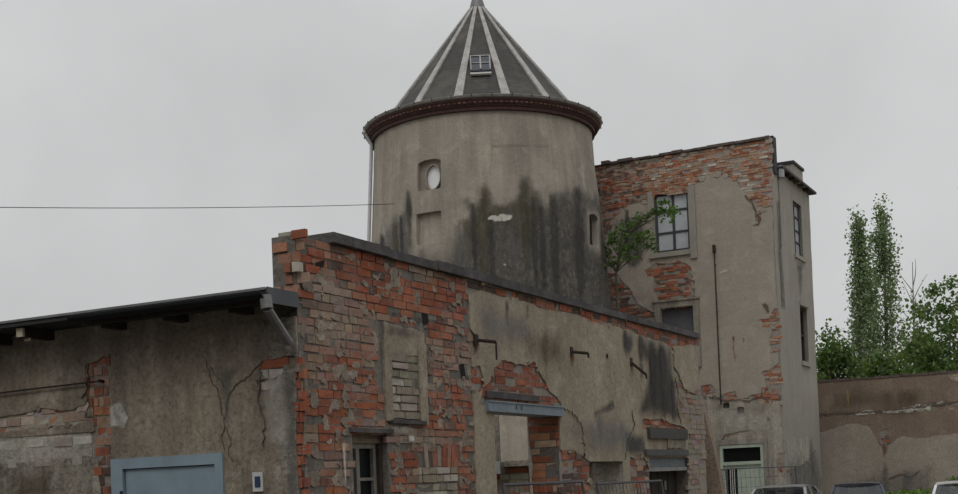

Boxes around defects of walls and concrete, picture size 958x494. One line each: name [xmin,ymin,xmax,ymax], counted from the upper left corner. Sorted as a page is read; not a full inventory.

leakage [380,193,411,254]
leakage [447,182,612,310]
spalling [595,137,774,239]
spalling [0,353,113,494]
crack [206,359,280,462]
crack [564,408,584,441]
spalling [459,260,785,494]
leakage [624,331,678,417]